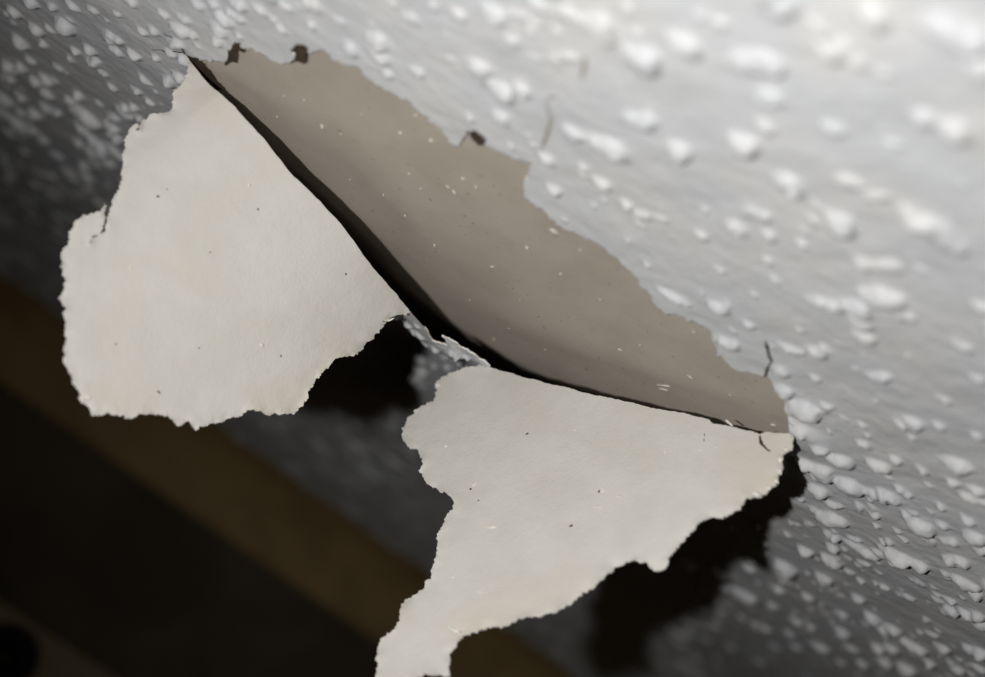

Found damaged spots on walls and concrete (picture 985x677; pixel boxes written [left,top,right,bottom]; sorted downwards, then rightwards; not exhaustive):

peeling [58,42,795,677]